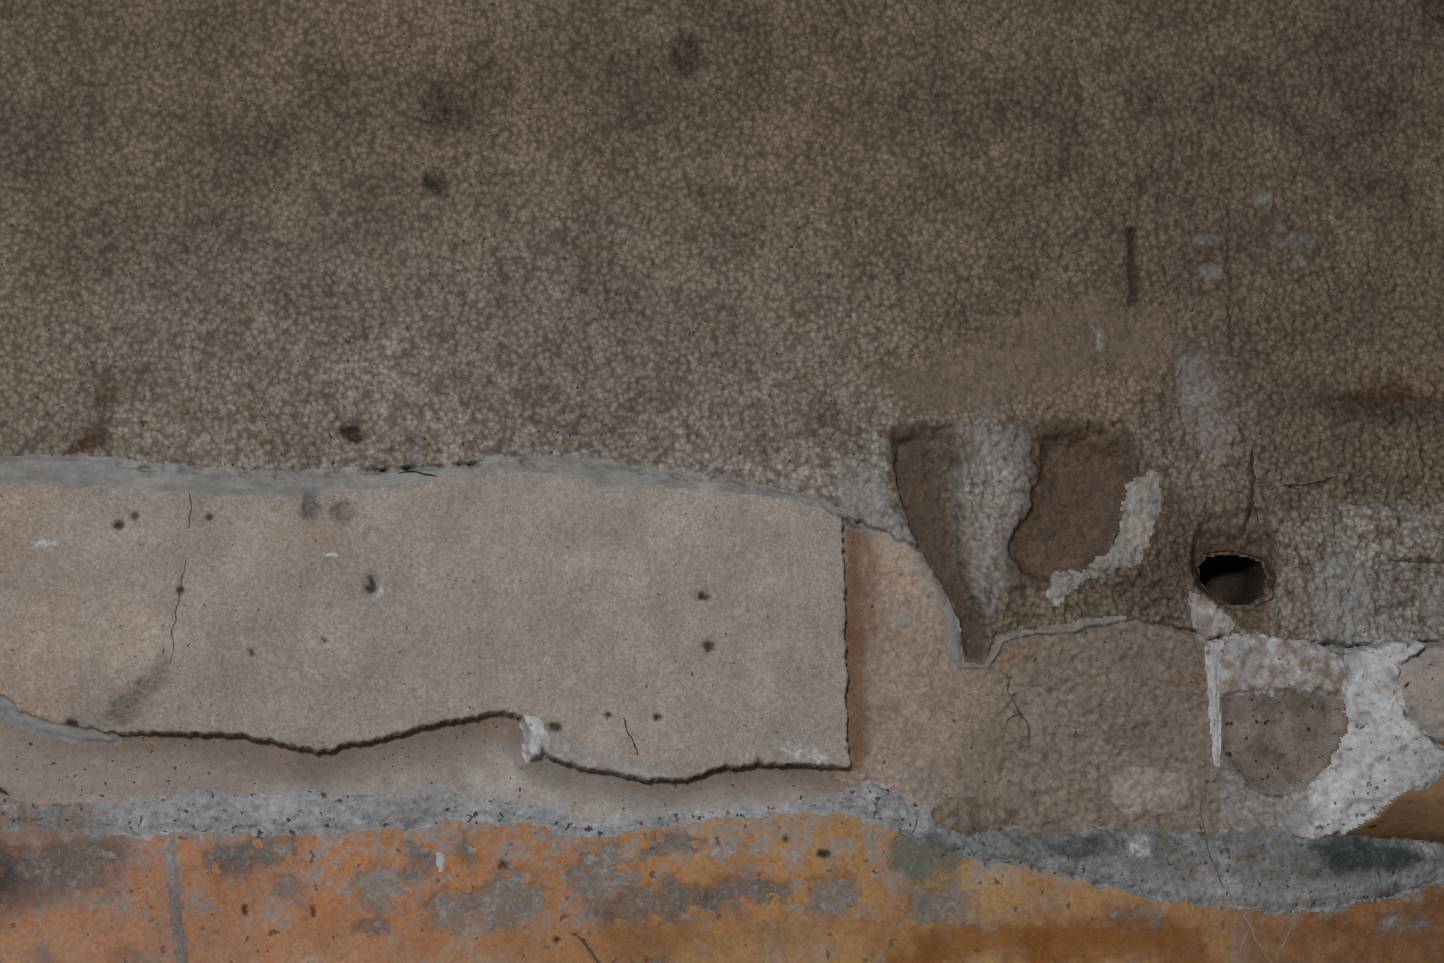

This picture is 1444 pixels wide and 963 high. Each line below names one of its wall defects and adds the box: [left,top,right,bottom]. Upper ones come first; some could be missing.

crack [170,493,192,664]
spalling [886,427,982,661]
spalling [1003,423,1161,606]
spalling [1204,630,1352,799]